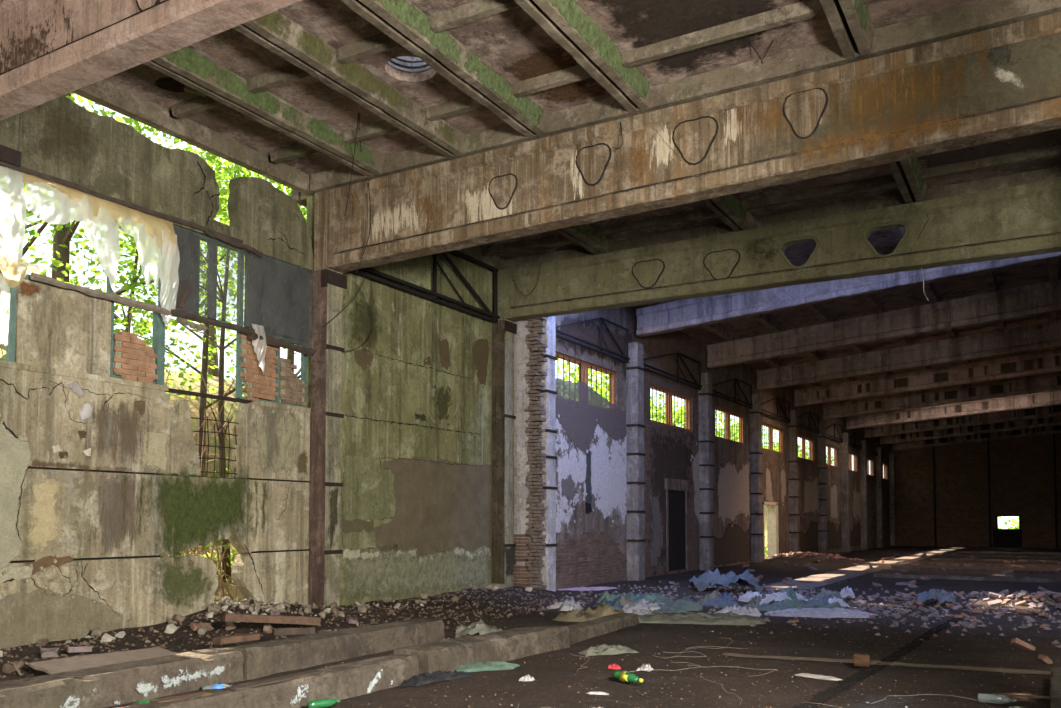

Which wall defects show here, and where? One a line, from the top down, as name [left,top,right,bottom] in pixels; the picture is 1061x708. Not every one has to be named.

peeling [0,0,74,74]
spalling [155,77,206,97]
damp [344,301,377,391]
crack [0,379,143,427]
mould [415,385,452,428]
spalling [514,316,632,590]
damp [326,487,491,598]
crack [57,561,114,612]